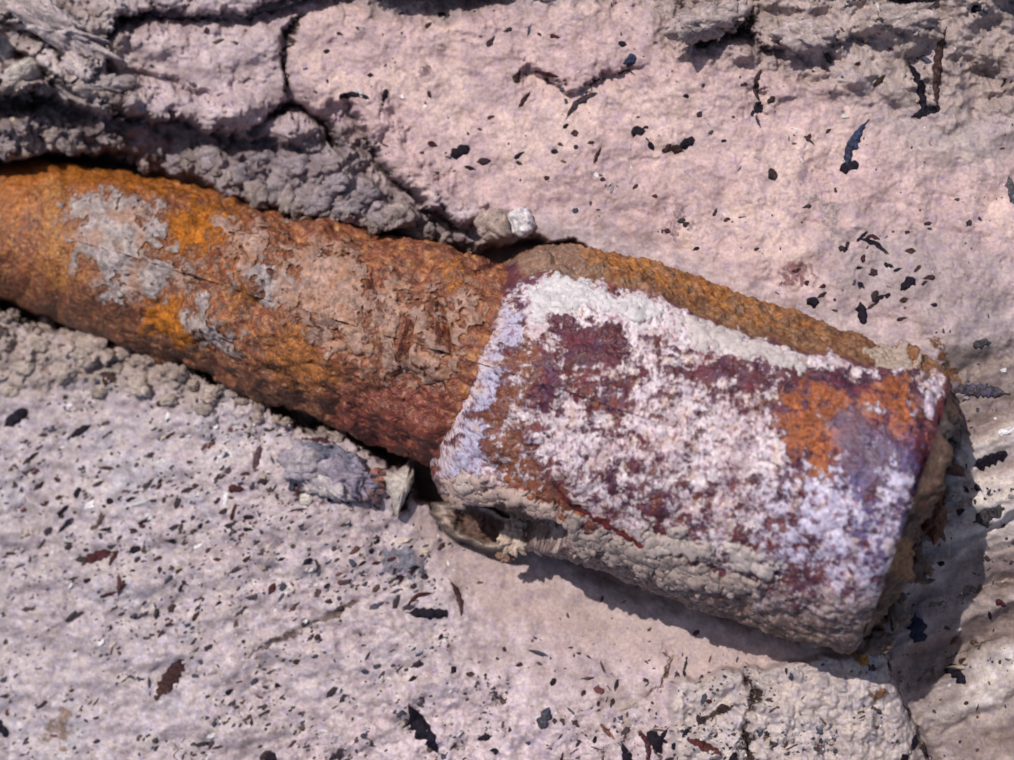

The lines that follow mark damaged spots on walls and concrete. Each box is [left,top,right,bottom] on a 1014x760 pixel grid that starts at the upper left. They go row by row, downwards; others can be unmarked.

crack [118,0,459,231]
crack [524,69,635,95]
crack [695,14,771,53]
rust [44,158,244,262]
spalling [0,127,454,359]
rust [137,289,200,361]
spalling [0,308,347,443]
rust [256,313,340,401]
peeling [365,261,946,635]
rust [775,376,847,478]
rust [877,372,922,436]
rust [928,337,962,386]